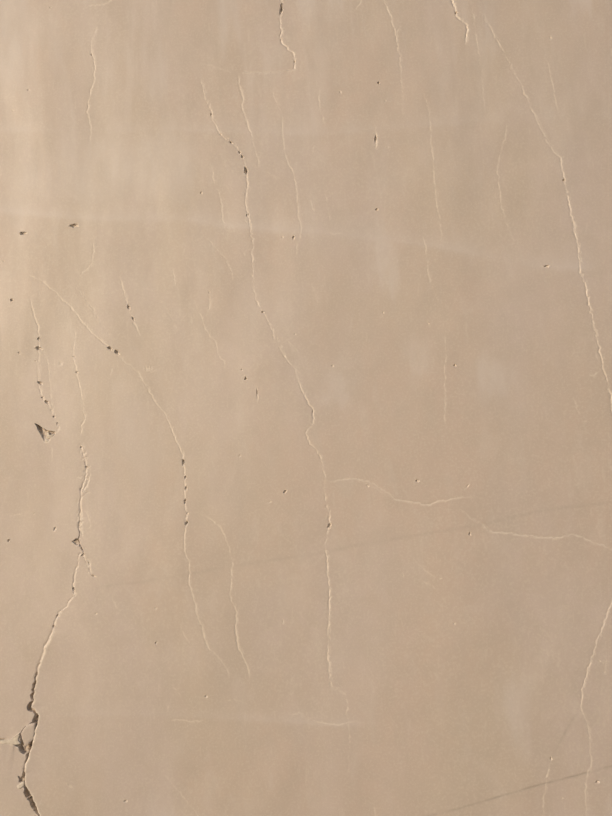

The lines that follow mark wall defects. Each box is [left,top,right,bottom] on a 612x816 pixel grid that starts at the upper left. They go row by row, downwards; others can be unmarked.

spalling [33,422,57,464]
crack [0,440,99,816]
crack [26,272,253,681]
crack [198,0,353,778]
crack [450,0,612,419]
crack [578,591,612,816]